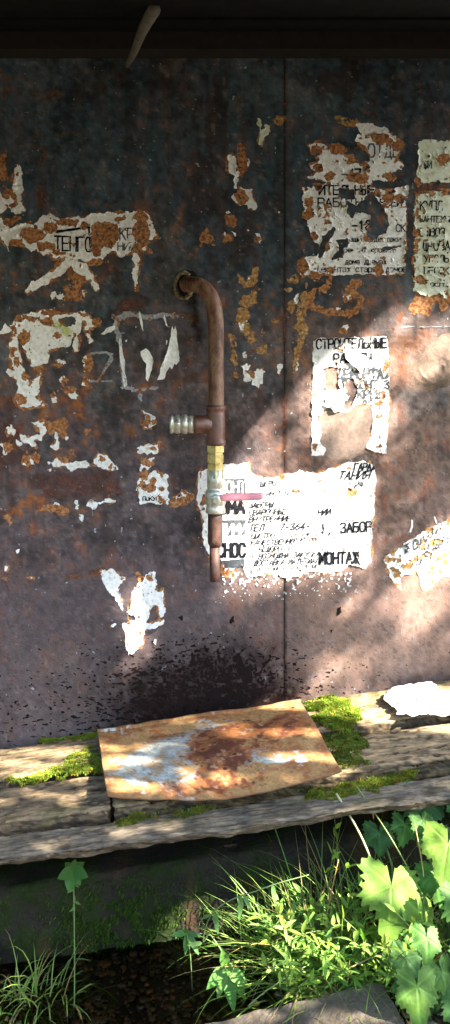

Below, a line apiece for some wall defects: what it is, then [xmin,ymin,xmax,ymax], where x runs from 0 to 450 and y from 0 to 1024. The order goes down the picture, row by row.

rust [334,101,386,150]
rust [42,272,87,302]
rust [228,267,377,374]
rust [397,296,449,317]
peeling [0,324,18,377]
peeling [50,352,79,403]
rust [75,349,123,402]
rust [0,398,24,485]
peeling [90,311,191,559]
rust [168,489,195,508]